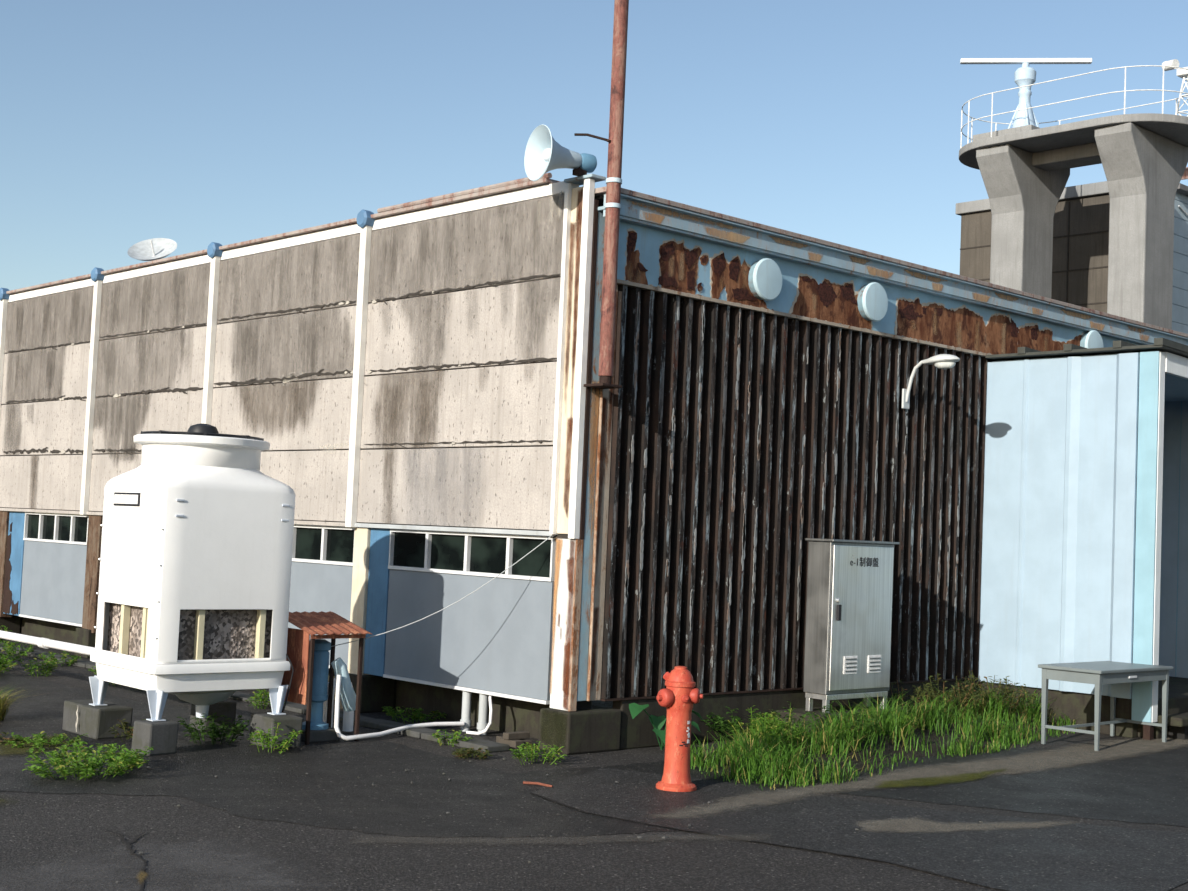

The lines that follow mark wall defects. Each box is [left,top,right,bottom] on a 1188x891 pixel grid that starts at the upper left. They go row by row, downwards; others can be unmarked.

leakage [7,264,209,403]
leakage [234,246,354,424]
leakage [530,192,563,249]
corrosion [565,189,583,386]
corrosion [624,201,773,310]
corrosion [770,236,822,262]
corrosion [789,273,873,330]
corrosion [849,256,1105,355]
leakage [94,395,147,459]
corrosion [564,418,573,514]
corrosion [590,292,617,555]
corrosion [551,540,574,710]